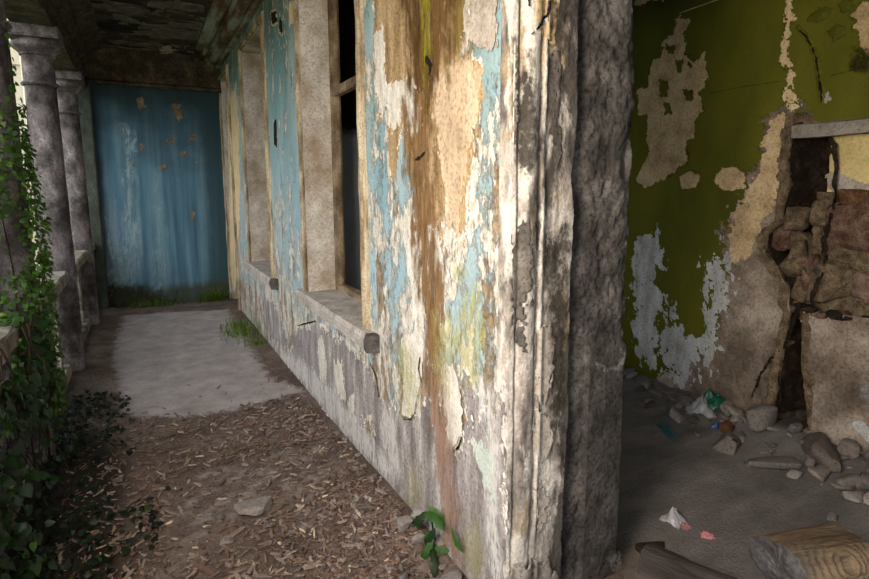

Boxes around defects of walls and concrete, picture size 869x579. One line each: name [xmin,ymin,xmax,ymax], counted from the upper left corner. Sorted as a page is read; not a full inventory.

damp [551,0,579,54]
peeling [848,1,869,57]
damp [513,44,538,174]
damp [283,351,421,503]
peeling [261,0,563,579]
damp [463,376,502,579]
damp [543,222,571,476]
peeling [628,14,869,453]
crack [751,303,801,401]